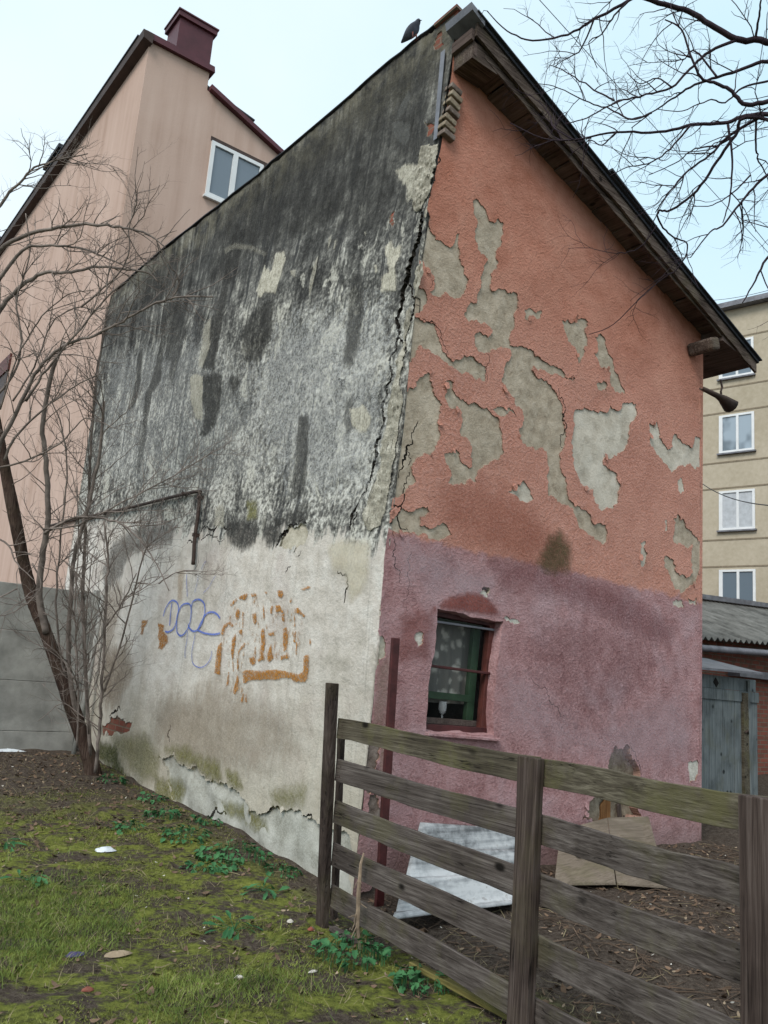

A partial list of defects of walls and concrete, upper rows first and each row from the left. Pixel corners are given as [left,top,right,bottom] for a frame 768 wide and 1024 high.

leakage [397,164,417,200]
leakage [131,303,186,429]
leakage [190,258,240,435]
leakage [242,252,285,361]
leakage [375,242,401,292]
crack [349,147,448,610]
spalling [390,199,638,545]
leakage [226,416,310,552]
spalling [649,422,700,494]
spalling [101,715,132,737]
spalling [159,754,387,899]
spalling [583,797,641,826]